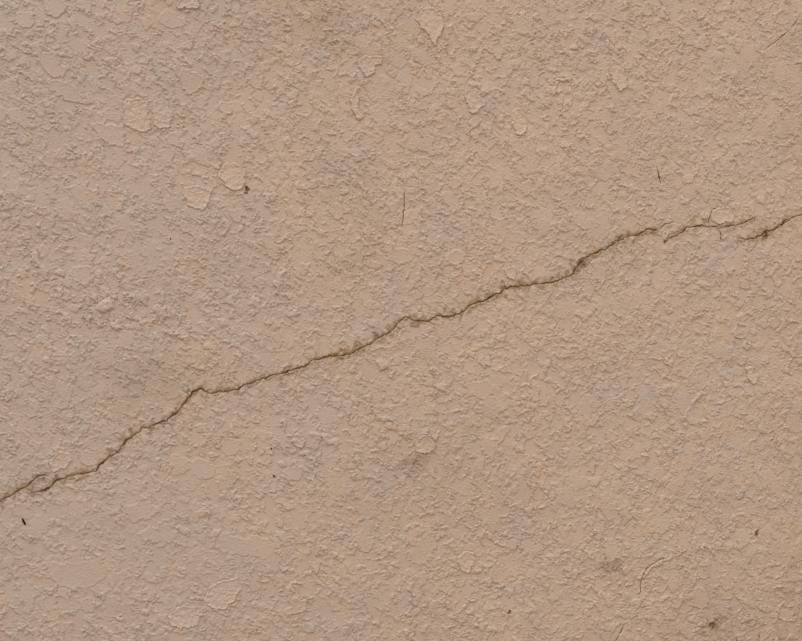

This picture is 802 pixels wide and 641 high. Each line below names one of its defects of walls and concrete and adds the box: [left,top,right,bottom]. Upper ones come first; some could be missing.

crack [0,207,802,502]